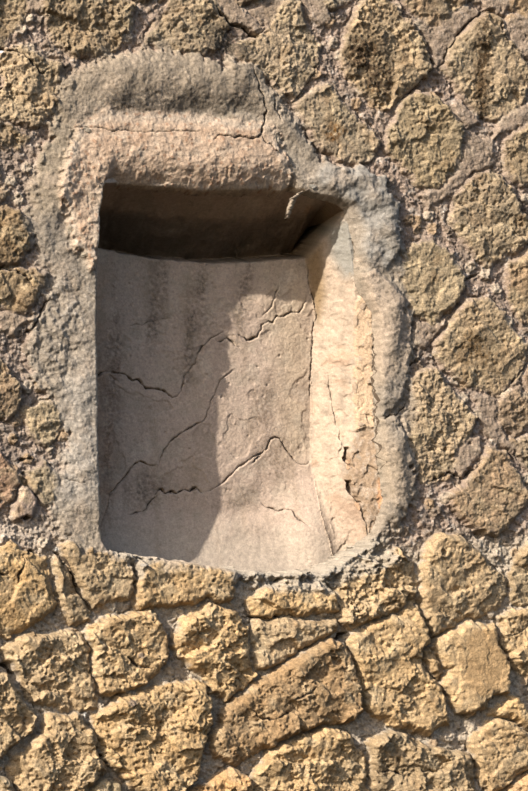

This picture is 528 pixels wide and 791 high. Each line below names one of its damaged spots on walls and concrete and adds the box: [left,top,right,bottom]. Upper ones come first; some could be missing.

water stain [349,36,390,91]
water stain [475,24,493,111]
crack [97,272,341,441]
crack [101,374,228,523]
crack [130,437,308,515]